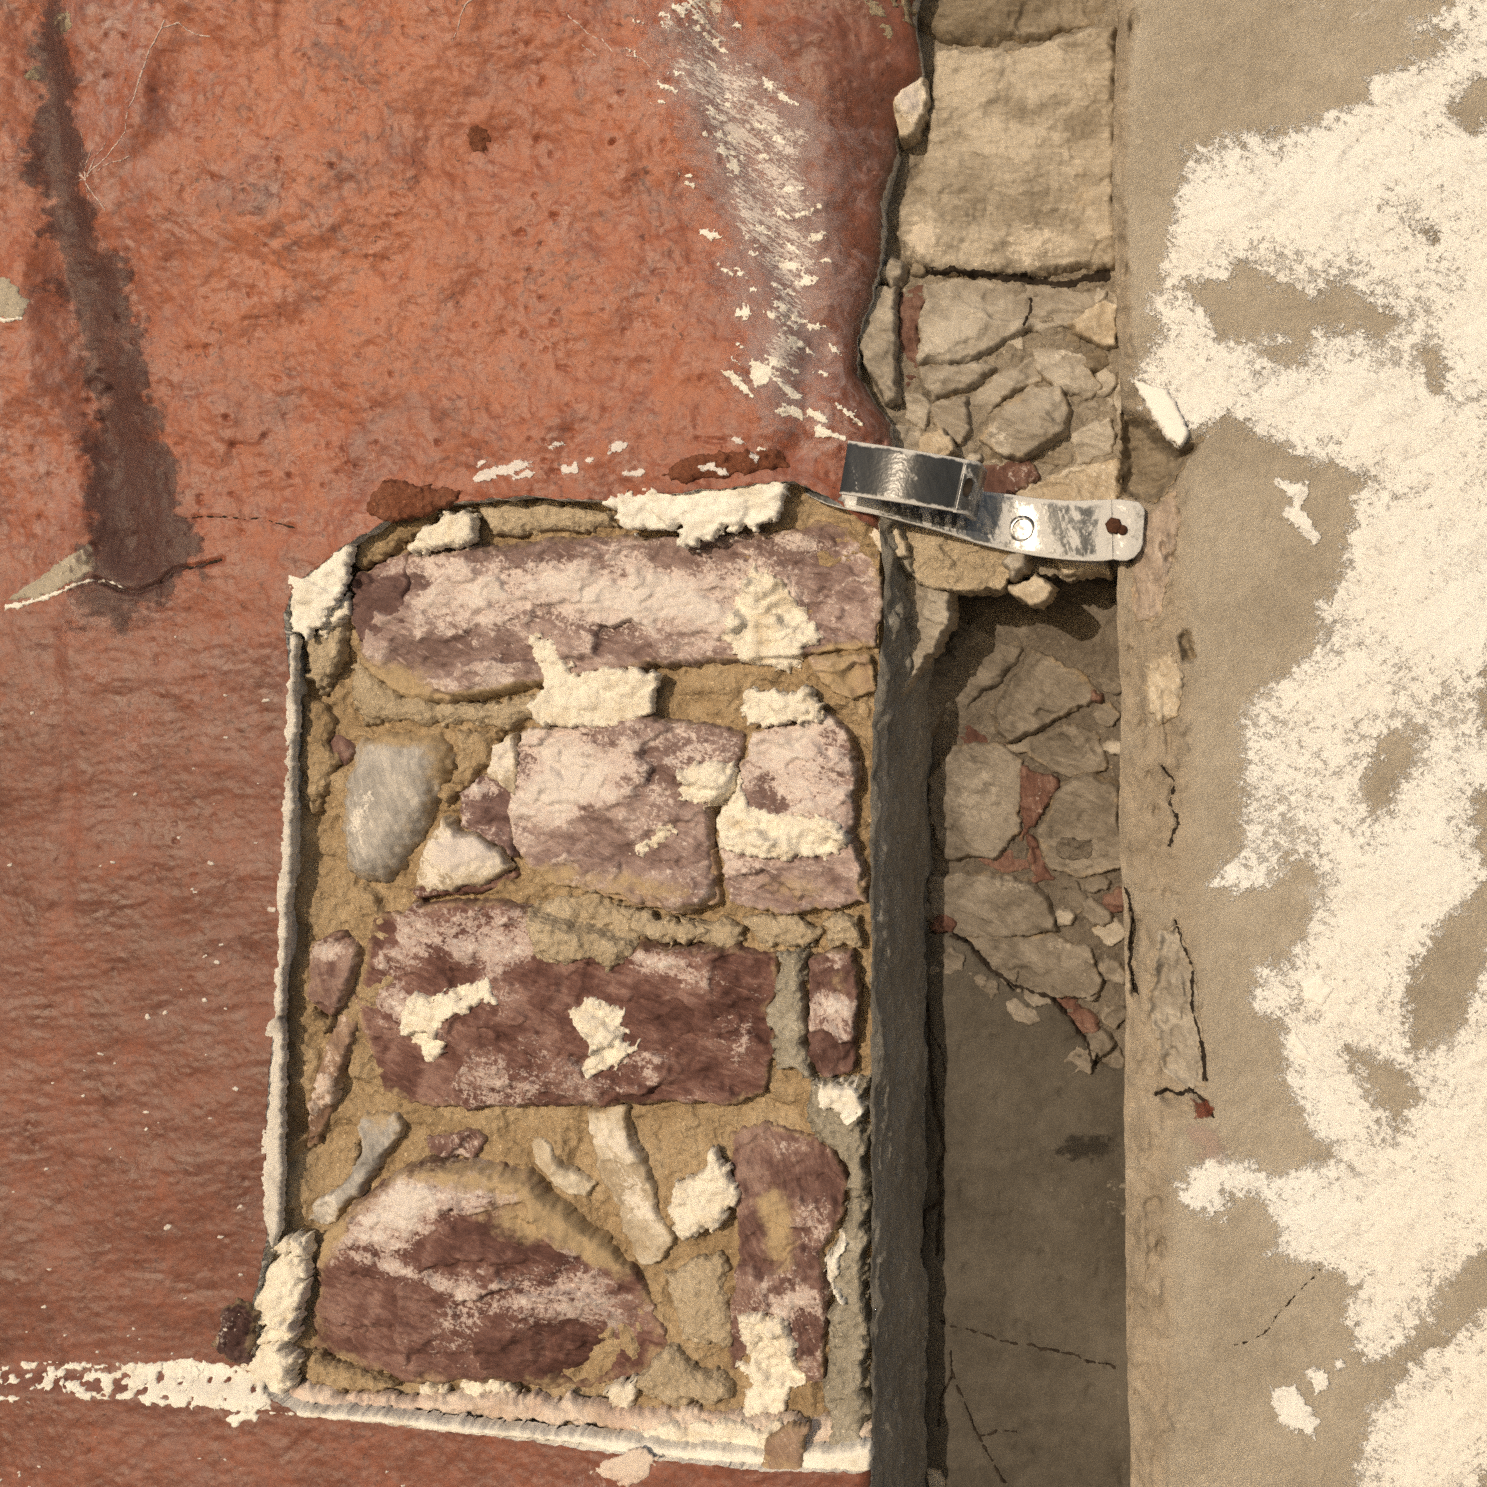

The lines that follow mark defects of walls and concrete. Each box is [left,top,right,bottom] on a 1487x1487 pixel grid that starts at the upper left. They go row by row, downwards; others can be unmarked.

peeling [864,0,918,43]
efflorescence [632,0,865,441]
damp [20,0,204,631]
crack [1161,765,1181,847]
flaking render [0,448,911,1471]
crack [949,932,1097,1069]
crack [1124,887,1138,994]
crack [1154,919,1215,1118]
crack [937,1320,1116,1483]